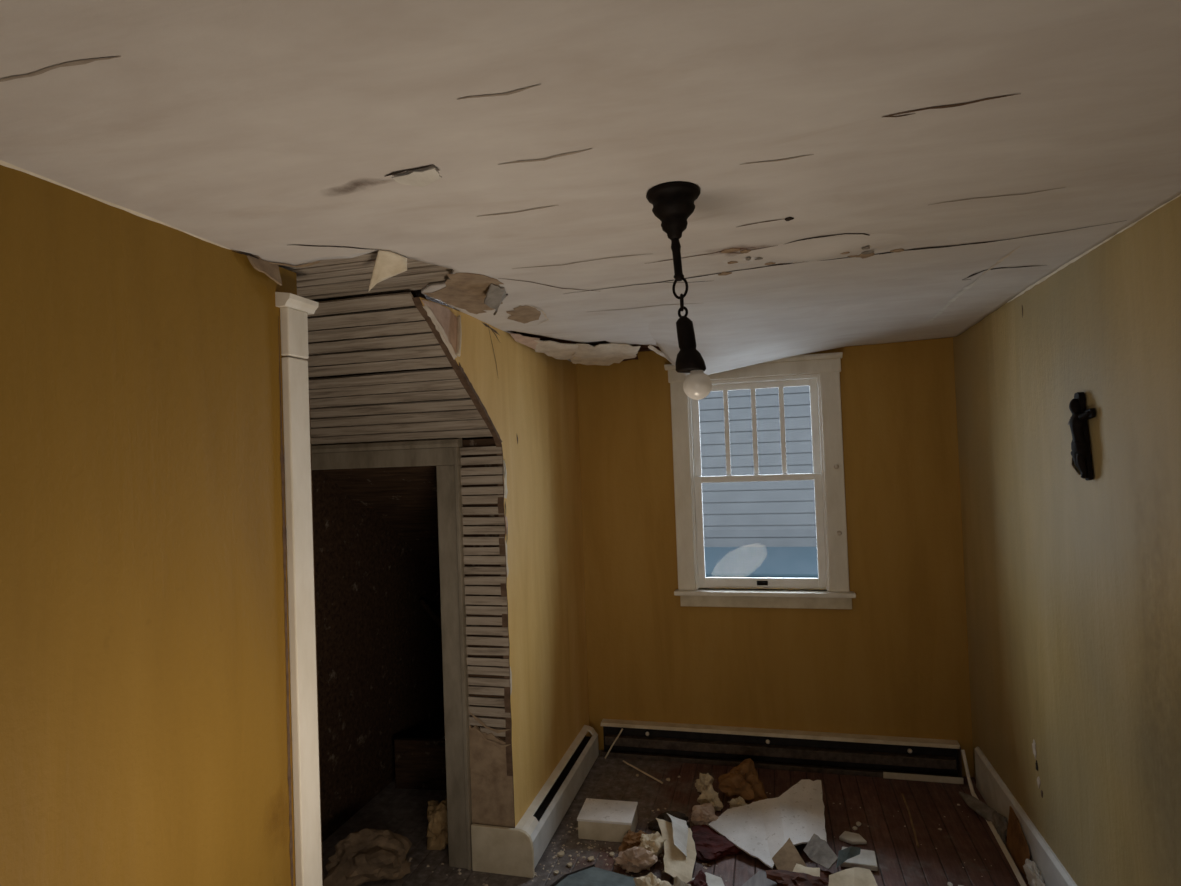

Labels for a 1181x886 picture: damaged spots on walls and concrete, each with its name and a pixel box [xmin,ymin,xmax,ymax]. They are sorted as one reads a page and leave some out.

crack [883,94,1018,117]
peeling [384,164,442,187]
spalling [233,251,320,286]
peeling [299,245,407,292]
crack [498,217,1127,294]
peeling [424,273,549,324]